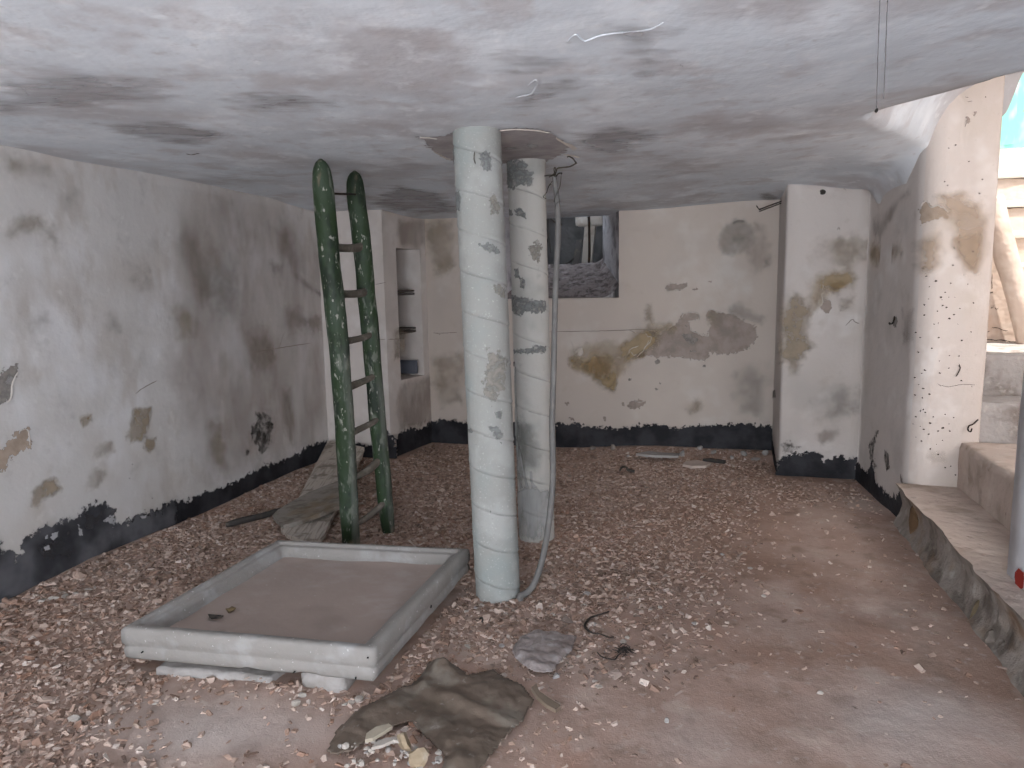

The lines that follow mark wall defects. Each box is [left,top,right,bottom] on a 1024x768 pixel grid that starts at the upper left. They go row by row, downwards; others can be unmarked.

peeling [918,201,949,226]
spalling [493,269,546,316]
peeling [617,309,758,367]
peeling [0,363,18,405]
spalling [481,345,546,444]
peeling [0,427,32,472]
damp [246,413,273,454]
damp [34,480,60,500]